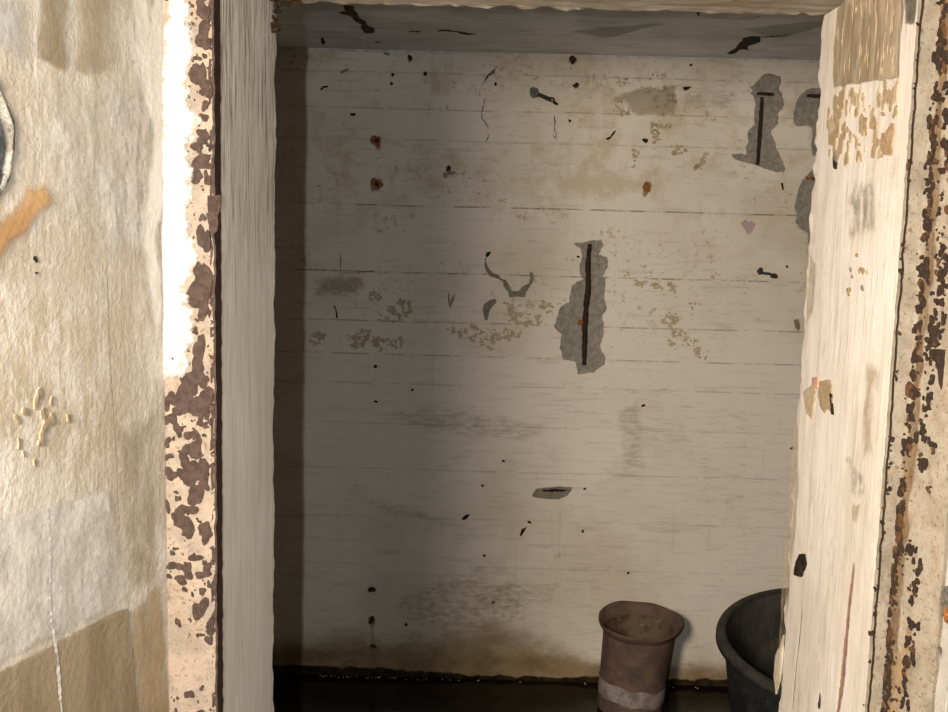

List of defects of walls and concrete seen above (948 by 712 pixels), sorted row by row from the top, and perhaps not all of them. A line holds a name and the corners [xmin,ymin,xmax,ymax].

peeling [727,0,902,190]
rust [0,187,51,252]
rust [370,178,383,190]
spalling [794,169,815,244]
spalling [446,240,608,374]
rust [872,0,948,712]
spalling [532,486,586,499]
water stain [272,634,600,683]
water stain [666,671,728,687]